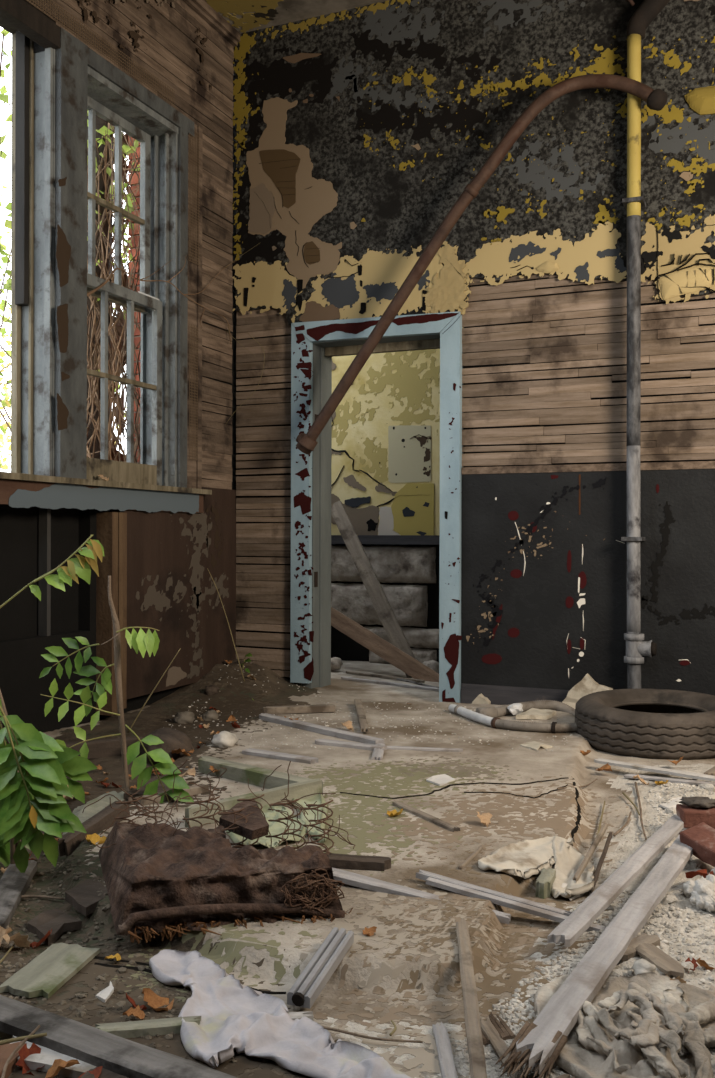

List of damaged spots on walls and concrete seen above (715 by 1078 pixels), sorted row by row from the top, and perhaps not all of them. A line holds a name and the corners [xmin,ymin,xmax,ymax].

peeling [643,36,692,78]
peeling [641,100,691,135]
spalling [206,0,627,417]
peeling [641,140,715,304]
peeling [294,493,312,526]
peeling [331,475,435,535]
peeling [441,477,611,702]
peeling [299,655,314,681]